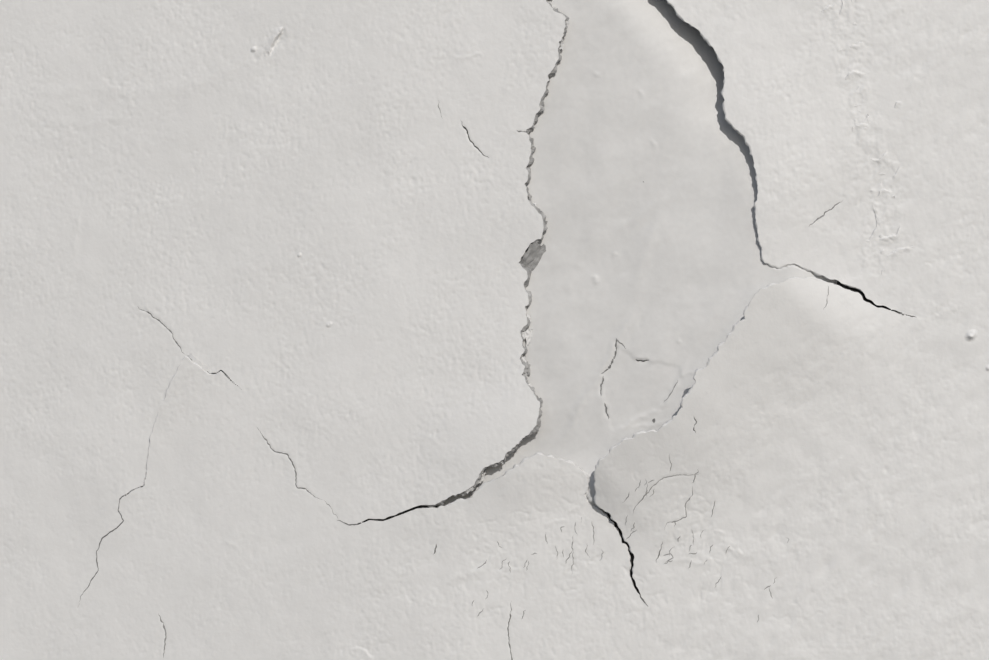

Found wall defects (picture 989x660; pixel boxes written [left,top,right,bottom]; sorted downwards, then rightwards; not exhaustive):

peeling [326,0,989,660]
crack [824,281,915,317]
crack [258,429,437,525]
crack [478,454,730,606]
crack [472,591,526,660]